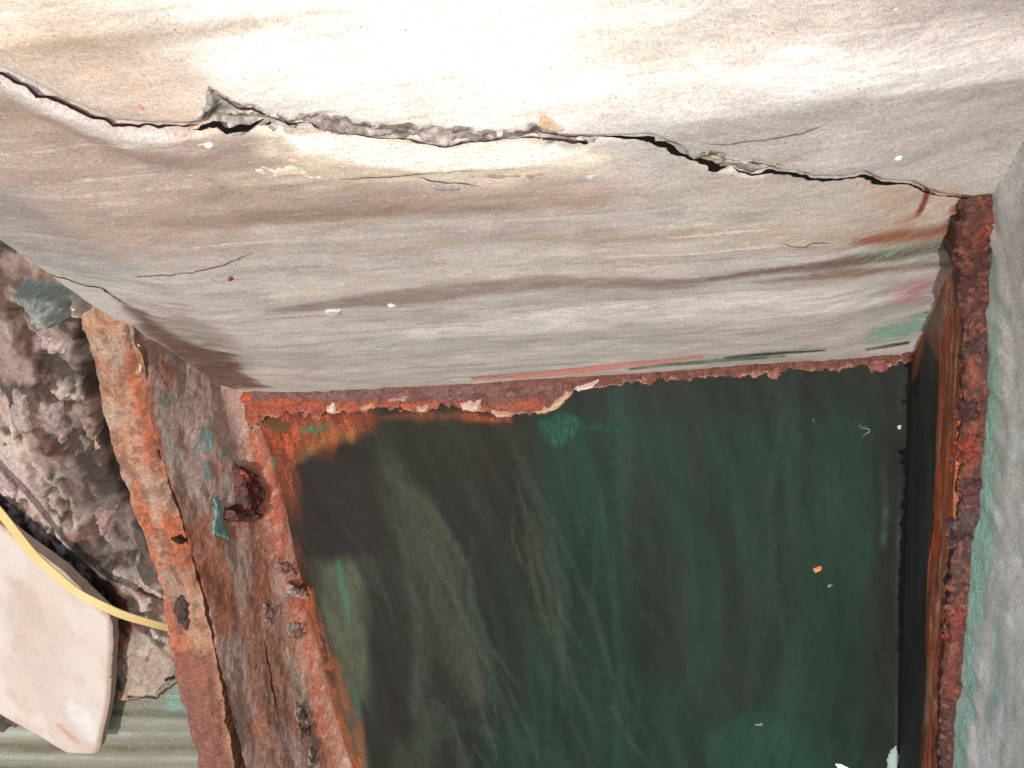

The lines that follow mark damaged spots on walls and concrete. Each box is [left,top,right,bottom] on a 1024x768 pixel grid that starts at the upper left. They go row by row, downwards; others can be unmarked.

crack [0,72,971,199]
corrosion [981,220,996,253]
corrosion [127,306,268,403]
corrosion [868,361,888,373]
corrosion [957,331,988,357]
corrosion [532,380,599,414]
corrosion [949,397,981,464]
corrosion [943,477,983,549]
corrosion [171,534,188,544]
corrosion [173,595,191,630]
corrosion [262,558,364,768]